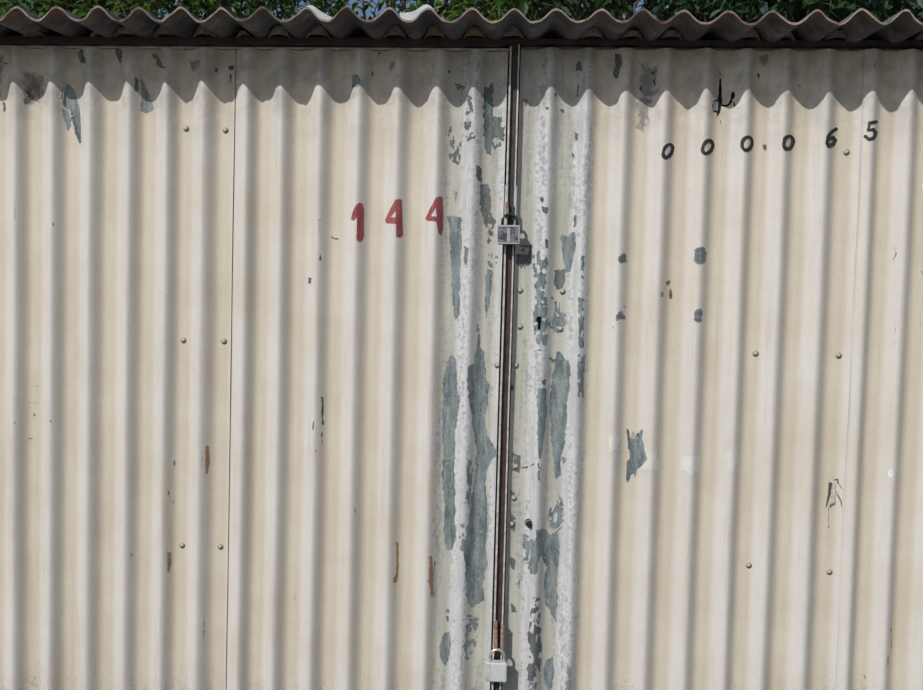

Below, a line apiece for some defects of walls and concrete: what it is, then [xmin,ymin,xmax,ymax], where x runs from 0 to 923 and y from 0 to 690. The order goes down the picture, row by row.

peeling [60,84,82,145]
peeling [448,83,505,164]
peeling [447,216,469,320]
peeling [476,165,498,317]
peeling [442,324,497,661]
peeling [626,428,647,482]
peeling [439,609,451,665]
peeling [510,491,564,690]